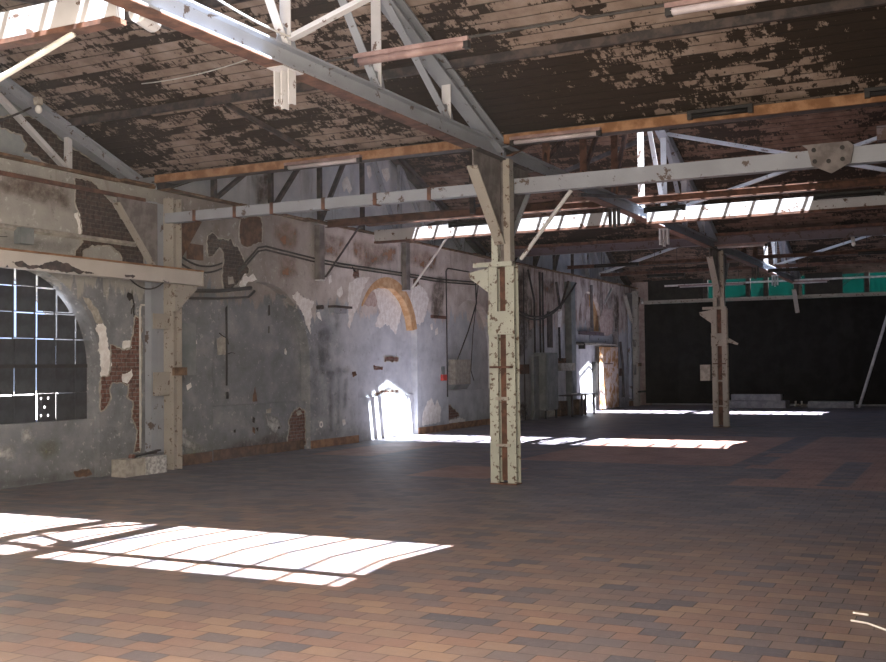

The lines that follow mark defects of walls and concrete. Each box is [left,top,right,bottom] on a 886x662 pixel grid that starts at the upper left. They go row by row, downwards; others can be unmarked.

spalling [0,114,145,274]
spalling [206,216,263,293]
peeling [292,291,322,334]
peeling [328,267,402,334]
peeling [410,277,438,335]
spalling [83,297,143,453]
spalling [278,407,306,447]
peeling [422,398,465,427]